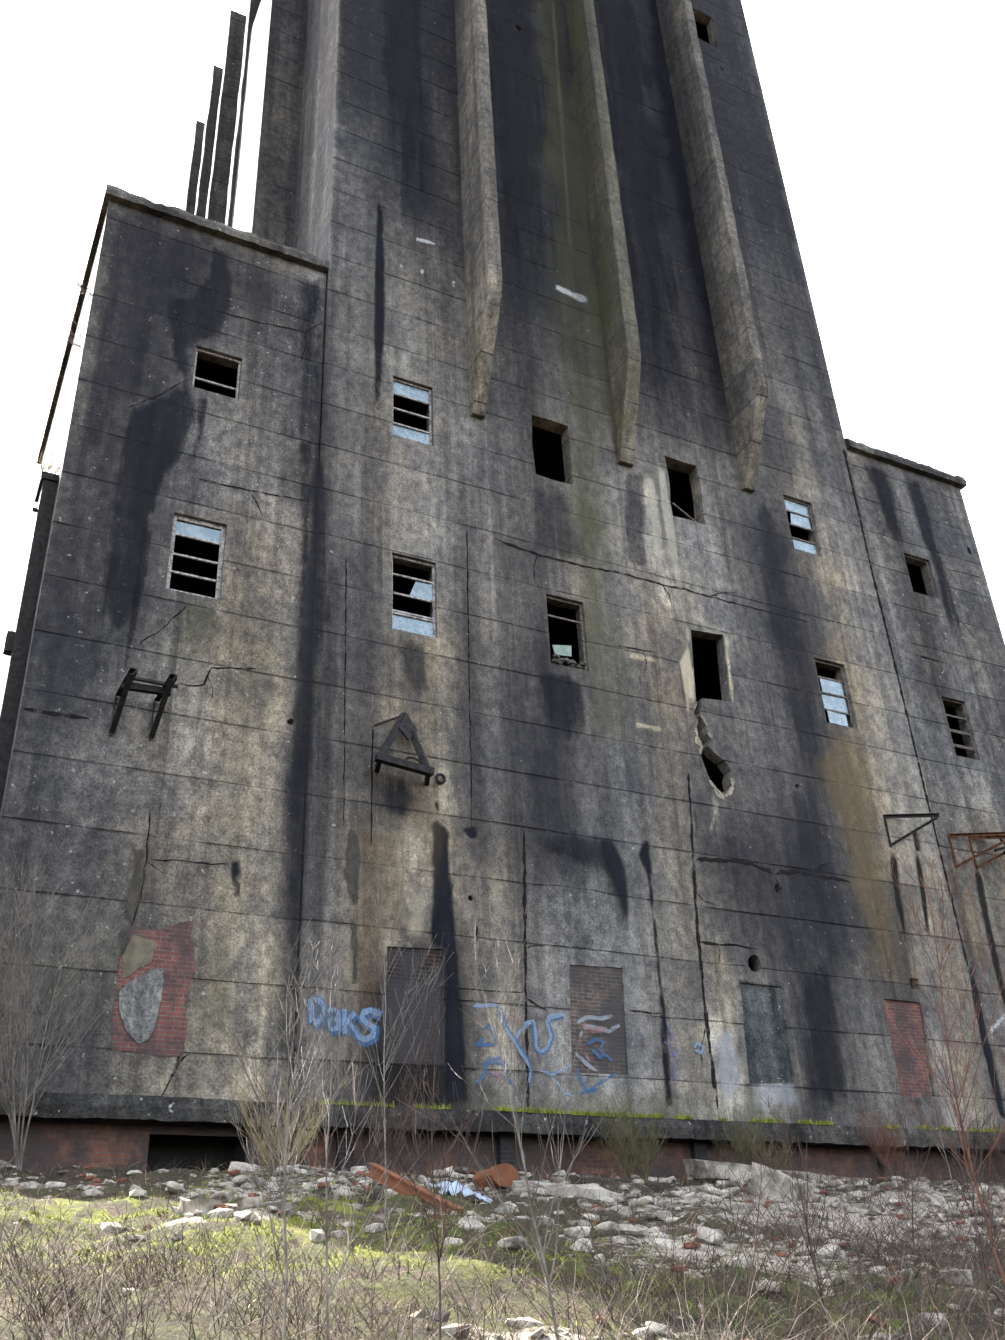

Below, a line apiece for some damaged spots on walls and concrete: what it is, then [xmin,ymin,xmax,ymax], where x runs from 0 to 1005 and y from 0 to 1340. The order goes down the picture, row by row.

water stain [384,0,423,187]
crack [139,605,187,645]
water stain [104,249,231,647]
crack [178,667,256,702]
crack [466,530,808,827]
water stain [869,467,901,537]
water stain [909,482,953,623]
peeling [708,778,735,800]
crack [687,774,850,1109]
water stain [969,969,1005,1117]